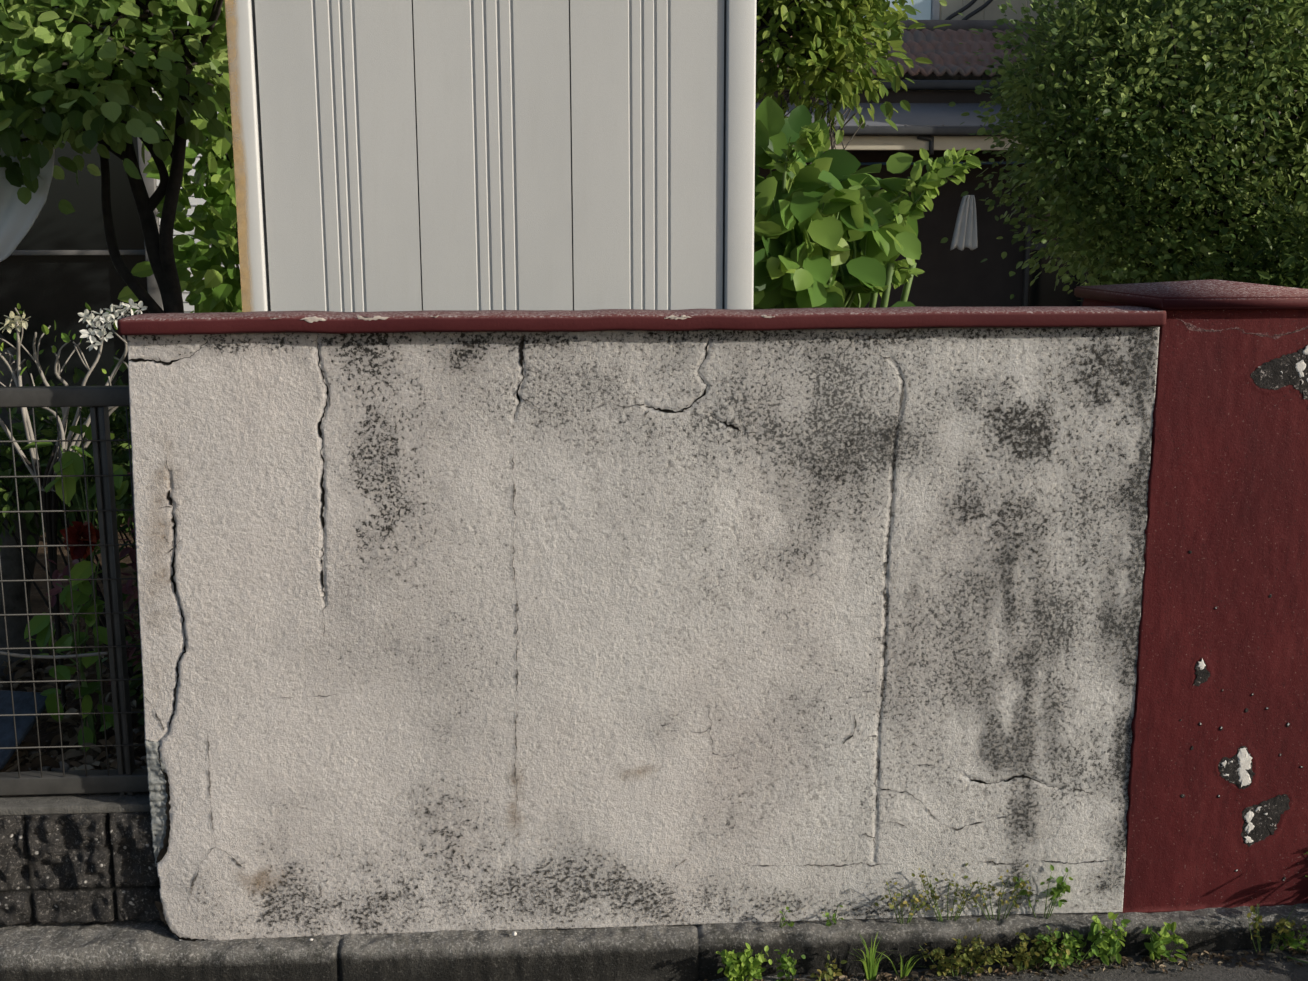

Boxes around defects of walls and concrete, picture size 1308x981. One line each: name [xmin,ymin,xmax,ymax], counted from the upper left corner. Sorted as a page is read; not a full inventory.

crack [145,454,186,863]
crack [155,736,242,941]
crack [317,336,331,636]
crack [508,337,564,832]
water stain [127,327,1159,939]
crack [599,337,769,444]
crack [746,353,1107,867]
peeling [1194,658,1210,686]
peeling [1217,746,1255,798]
peeling [1241,794,1290,847]
peeling [1251,345,1308,400]